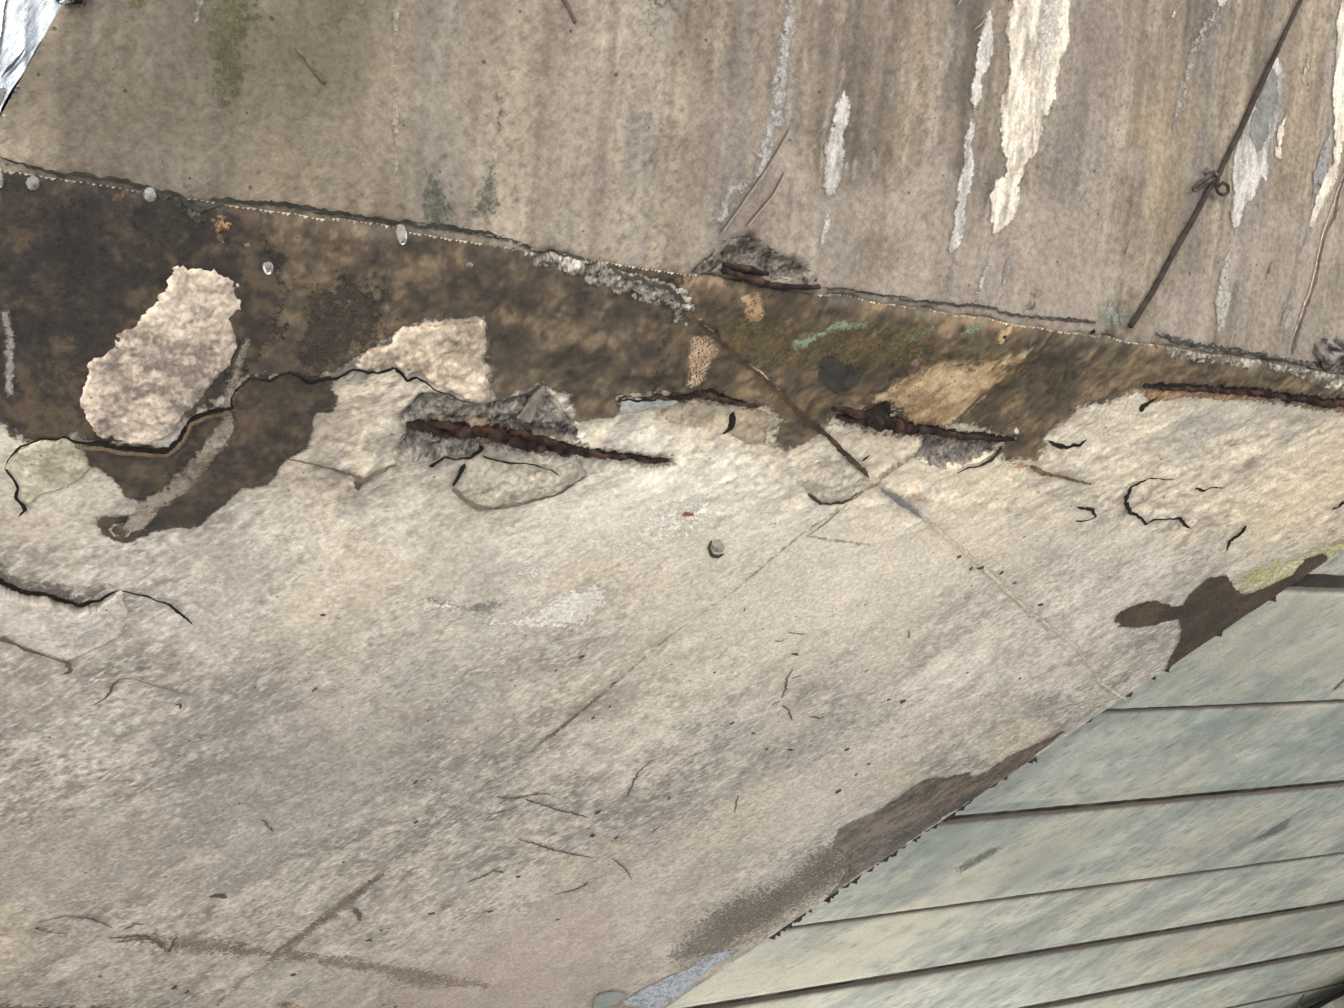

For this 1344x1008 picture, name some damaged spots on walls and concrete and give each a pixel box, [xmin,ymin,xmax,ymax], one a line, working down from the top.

leakage [947,0,1070,279]
efflorescence [1231,58,1286,228]
efflorescence [1304,0,1344,245]
crack [4,367,478,516]
spalling [0,157,775,445]
spalling [355,320,678,468]
peeling [831,347,1032,473]
rust [648,273,1344,471]
crack [1030,440,1222,529]
spalling [1140,332,1344,413]
crack [0,564,193,625]
leakage [592,731,1065,1008]